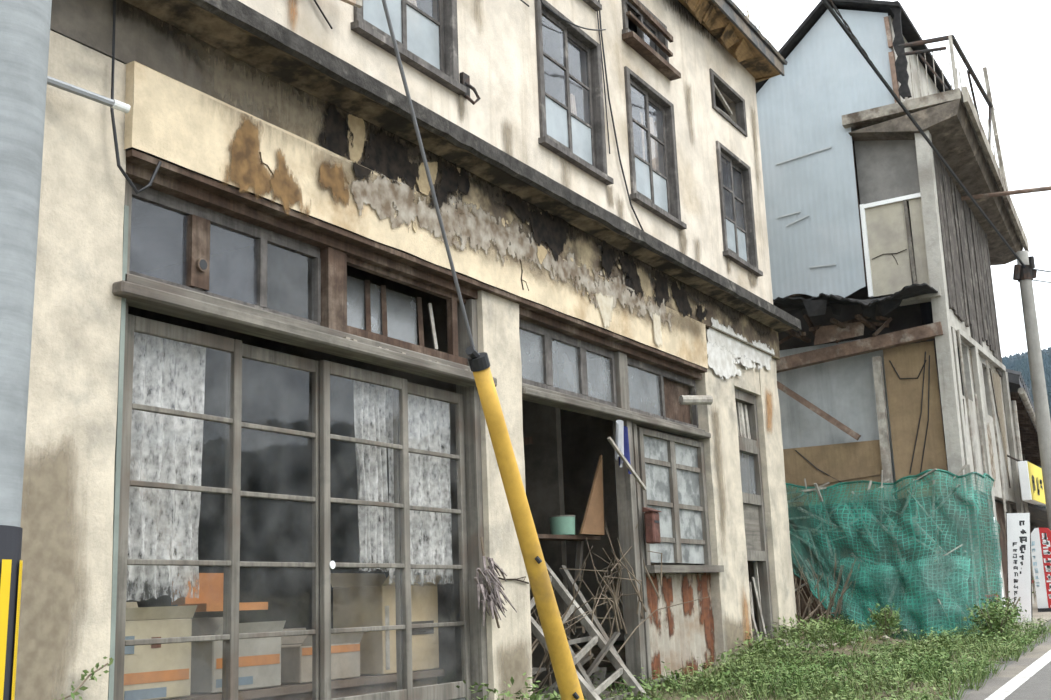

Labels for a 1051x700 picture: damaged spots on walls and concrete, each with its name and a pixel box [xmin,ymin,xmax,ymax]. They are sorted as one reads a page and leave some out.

damp [204,44,343,216]
damp [318,160,358,206]
damp [490,238,556,275]
spalling [318,103,775,379]
damp [568,275,701,348]
rust [646,573,715,675]
rust [651,652,662,685]